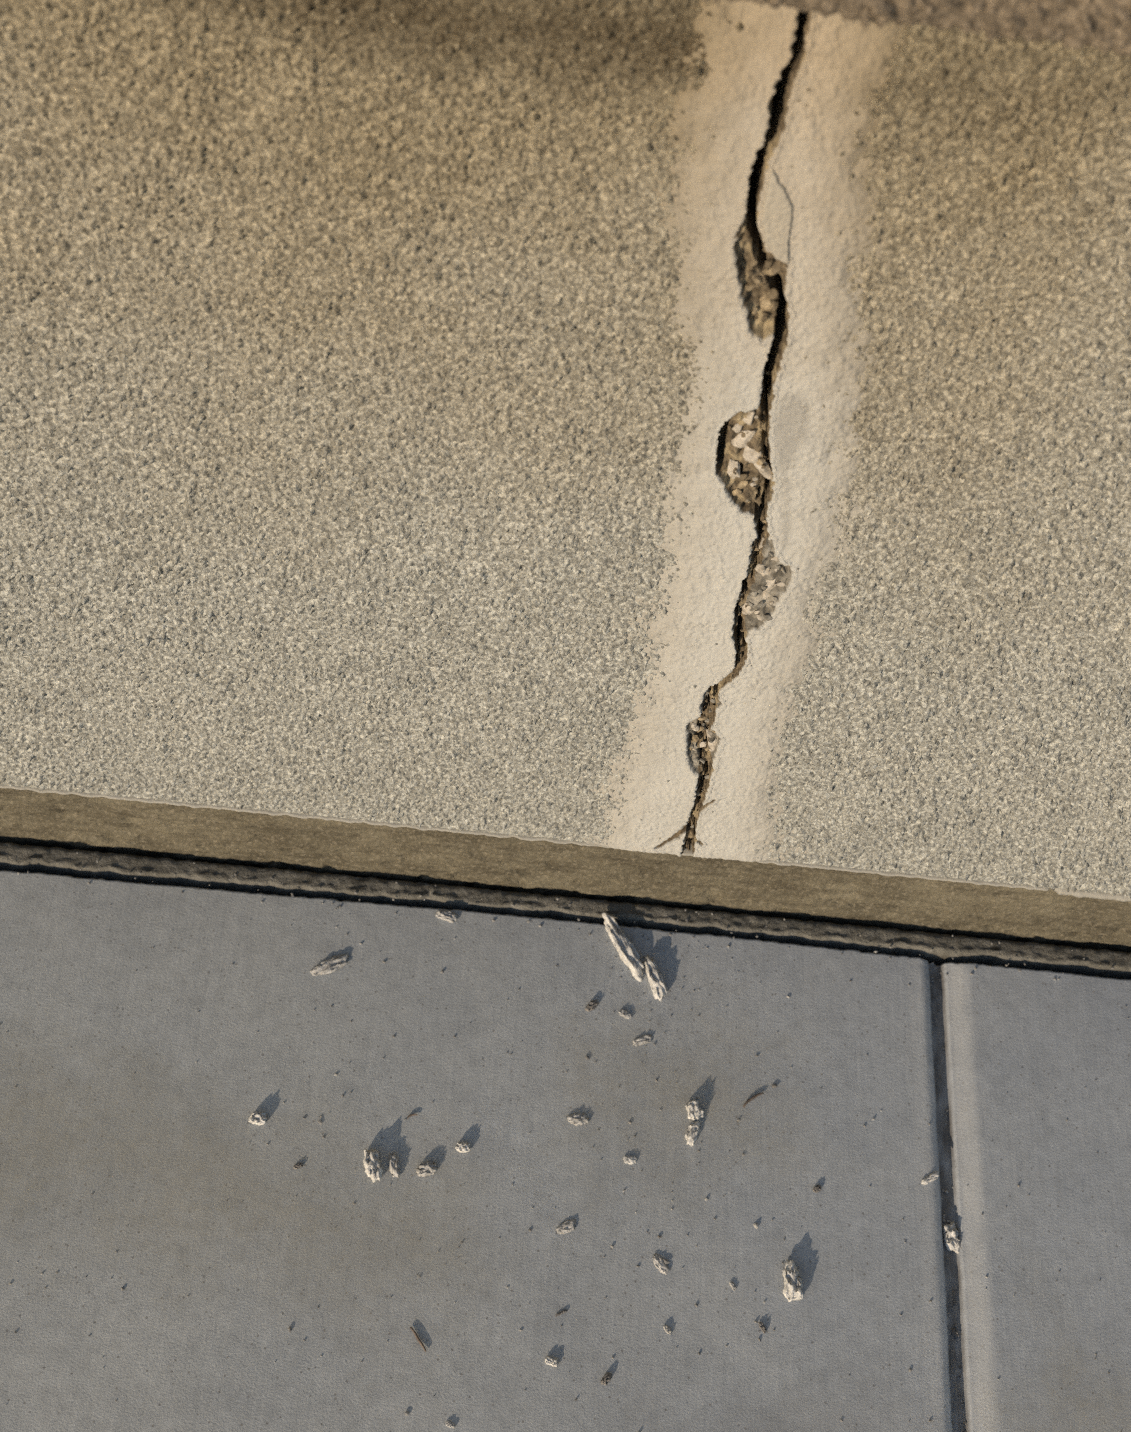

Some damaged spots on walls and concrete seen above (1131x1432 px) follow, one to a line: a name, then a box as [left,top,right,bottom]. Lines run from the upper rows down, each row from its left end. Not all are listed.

flaking render [727,169,796,348]
crack [650,8,818,857]
flaking render [711,401,783,518]
flaking render [740,536,799,643]
flaking render [681,682,727,777]